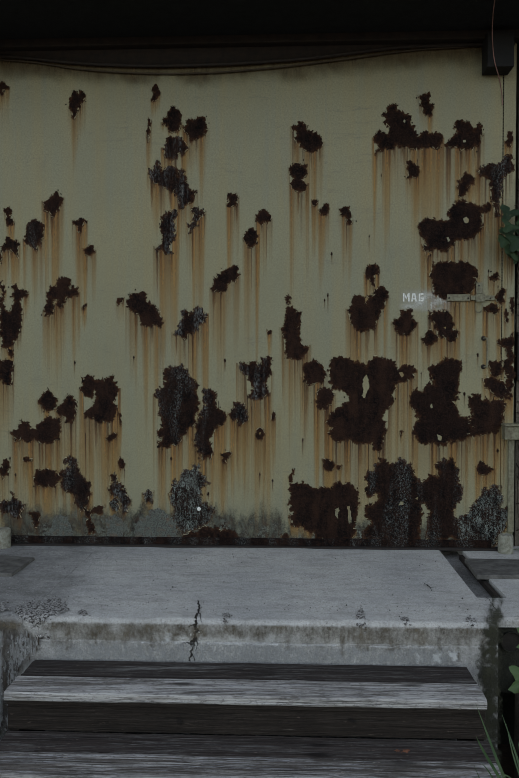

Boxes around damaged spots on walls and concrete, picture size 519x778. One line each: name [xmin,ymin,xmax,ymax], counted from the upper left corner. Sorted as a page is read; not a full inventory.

rust [0,190,96,395]
rust [116,91,516,547]
rust [0,374,132,535]
crack [184,600,202,661]
water stain [47,622,484,664]